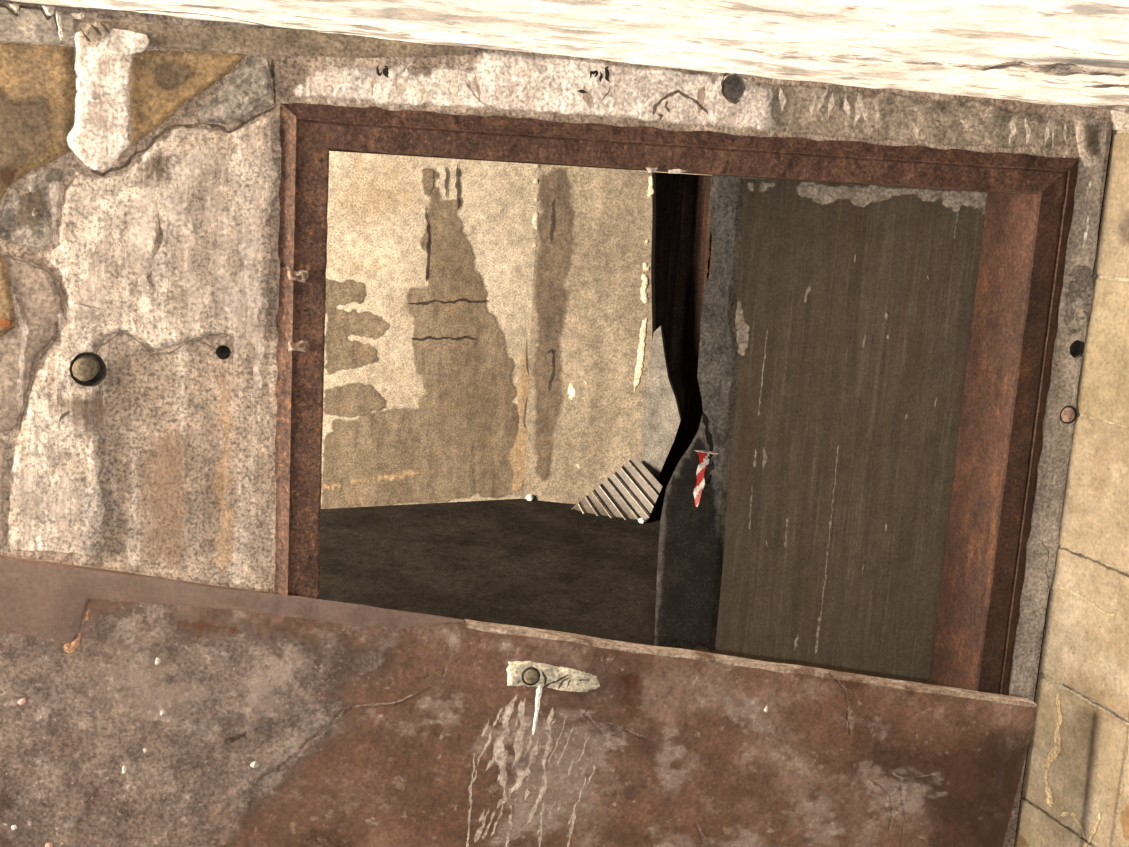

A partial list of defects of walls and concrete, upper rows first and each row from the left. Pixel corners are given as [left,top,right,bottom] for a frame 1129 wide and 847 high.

crack [84,10,373,36]
spalling [195,56,274,125]
leakage [0,93,50,173]
crack [63,59,276,205]
leakage [534,169,573,481]
corrosion [509,338,530,493]
peeling [0,168,467,847]
crack [1042,541,1129,616]
crack [1020,797,1094,847]